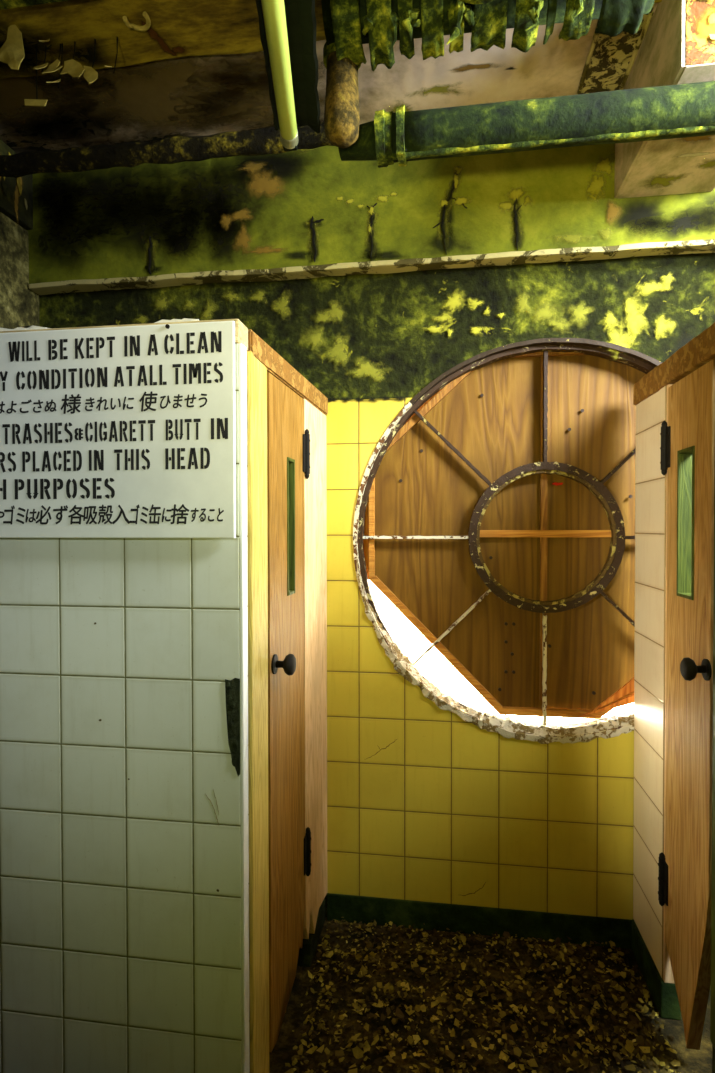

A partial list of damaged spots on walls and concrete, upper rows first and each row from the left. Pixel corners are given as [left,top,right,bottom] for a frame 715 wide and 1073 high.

peeling [0,25,118,106]
damp [0,52,274,153]
corrosion [123,11,186,56]
damp [33,154,305,262]
damp [616,196,715,237]
damp [650,175,683,187]
spalling [225,678,240,776]